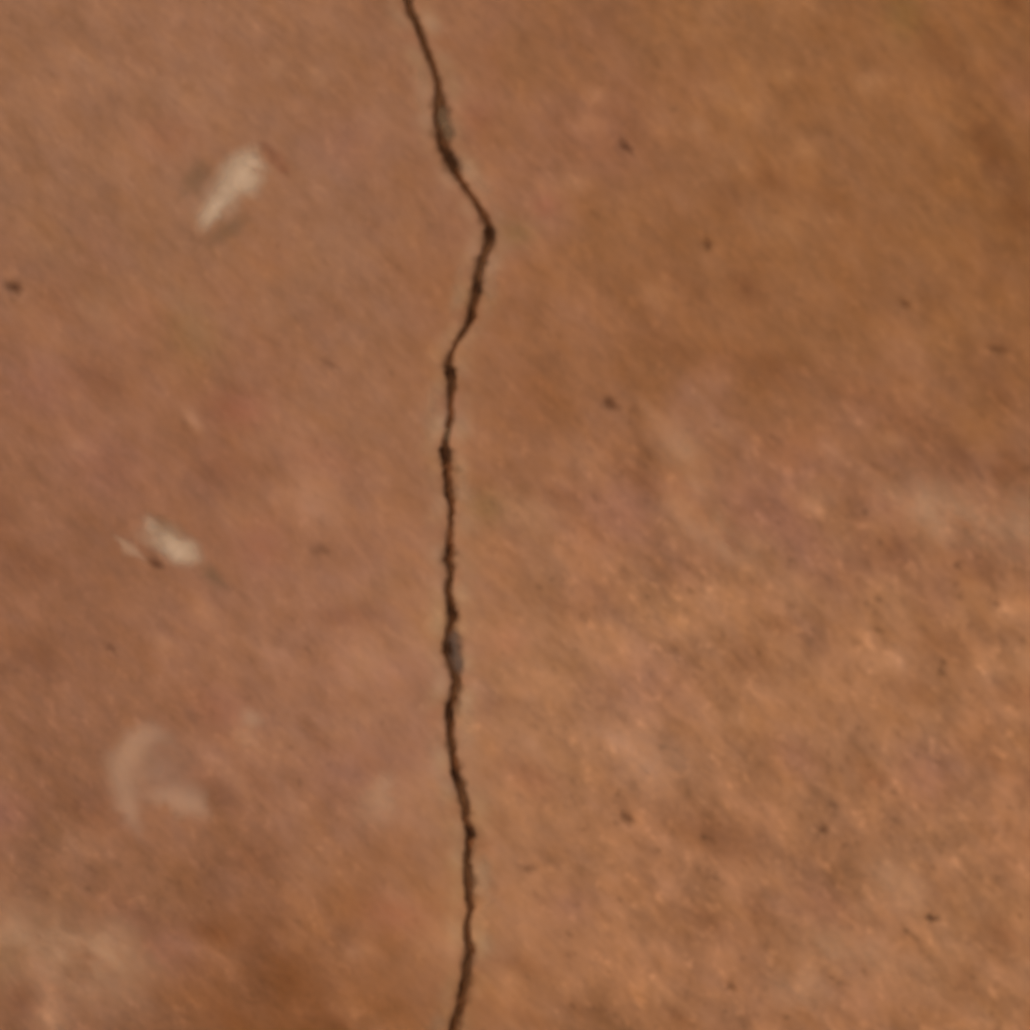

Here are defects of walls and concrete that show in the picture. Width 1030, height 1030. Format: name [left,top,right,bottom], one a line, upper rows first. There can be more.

crack [404,0,495,1030]